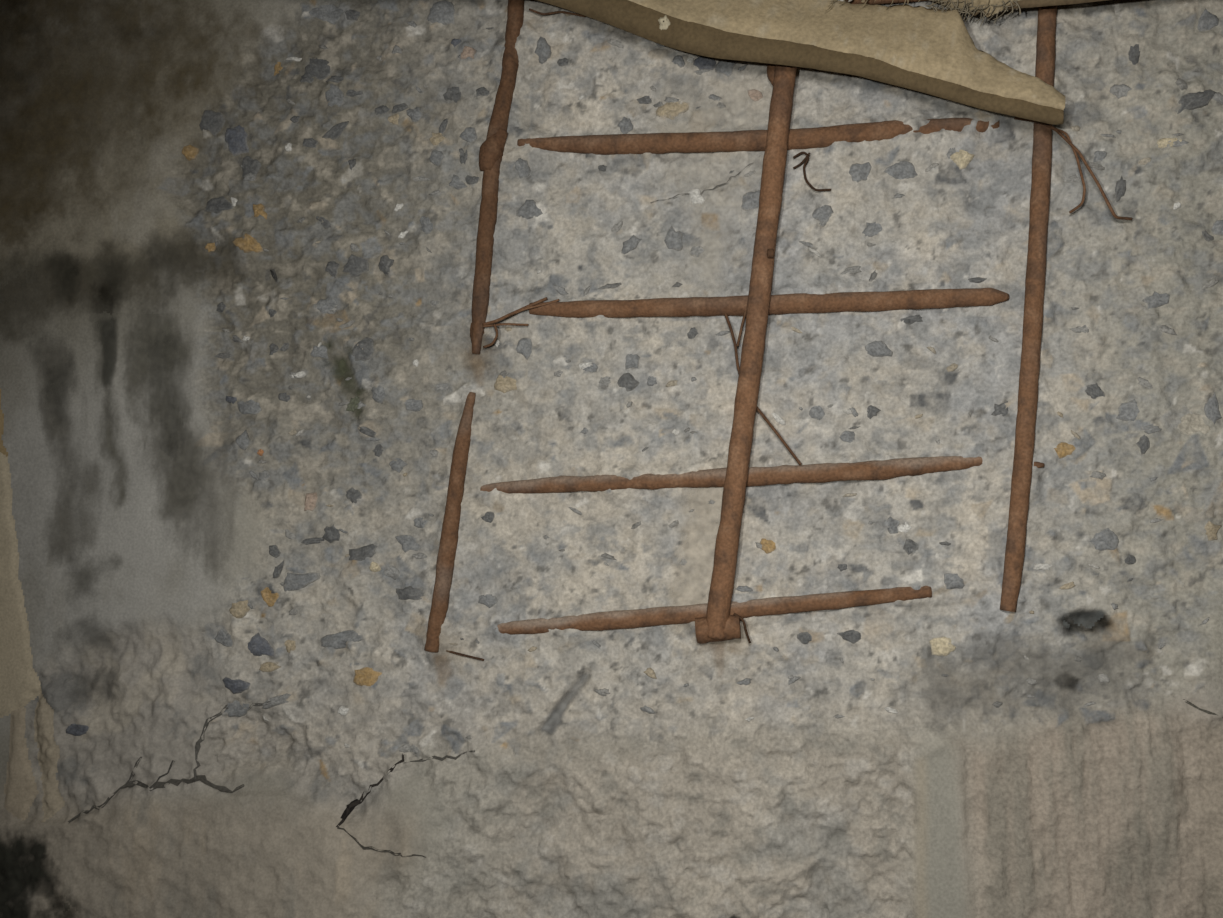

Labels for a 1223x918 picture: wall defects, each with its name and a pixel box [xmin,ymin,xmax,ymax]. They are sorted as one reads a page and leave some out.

damp [38,346,68,438]
damp [96,311,189,390]
damp [151,401,205,514]
spalling [171,0,1223,808]
crack [68,694,289,823]
crack [336,750,475,858]
spalling [373,730,917,918]
crack [1183,699,1223,718]